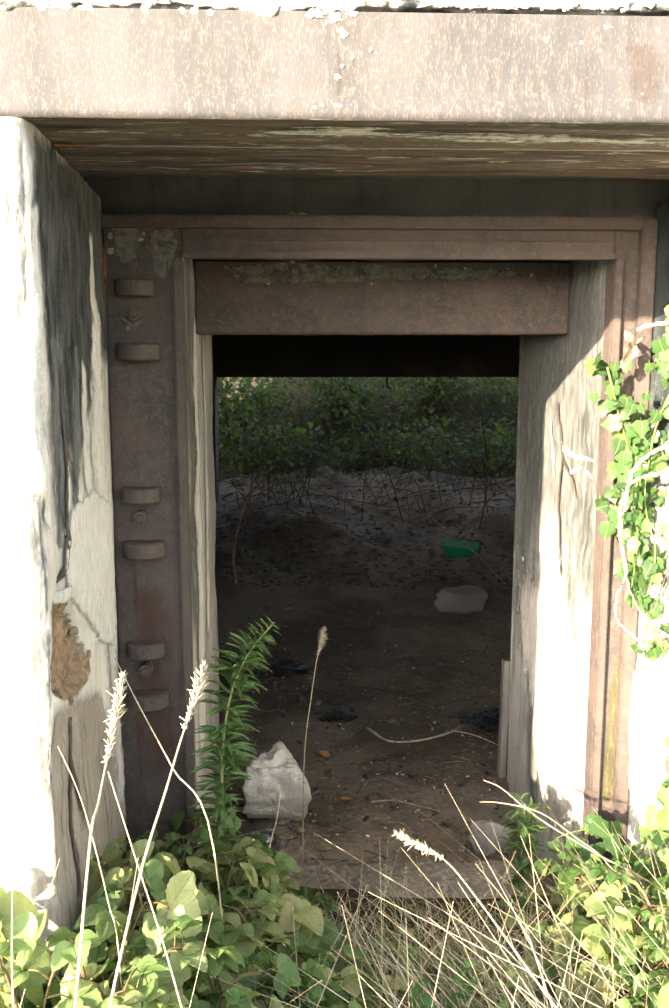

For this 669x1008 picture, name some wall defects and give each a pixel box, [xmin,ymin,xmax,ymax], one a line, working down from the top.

peeling [58,0,111,12]
peeling [179,5,214,16]
damp [259,126,669,147]
damp [654,207,669,340]
damp [654,361,669,437]
damp [0,117,127,956]
damp [658,450,669,643]
flaking render [50,489,115,705]
rust [137,710,172,771]